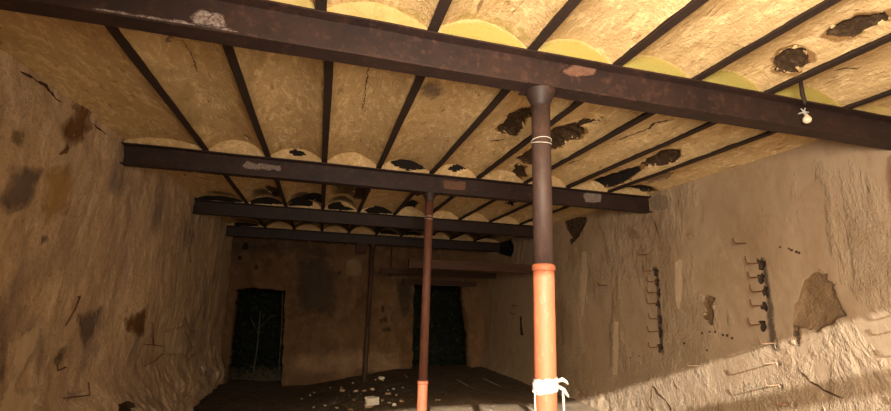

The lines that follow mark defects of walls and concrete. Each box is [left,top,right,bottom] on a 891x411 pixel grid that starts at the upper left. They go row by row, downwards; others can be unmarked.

spalling [821,9,891,42]
spalling [772,44,816,77]
crack [20,71,61,102]
damp [59,106,91,155]
spalling [495,106,531,137]
spalling [551,115,603,149]
crack [618,119,675,140]
spalling [594,149,681,192]
damp [1,167,70,217]
damp [125,310,146,336]
spalling [791,268,847,345]
damp [0,319,42,411]